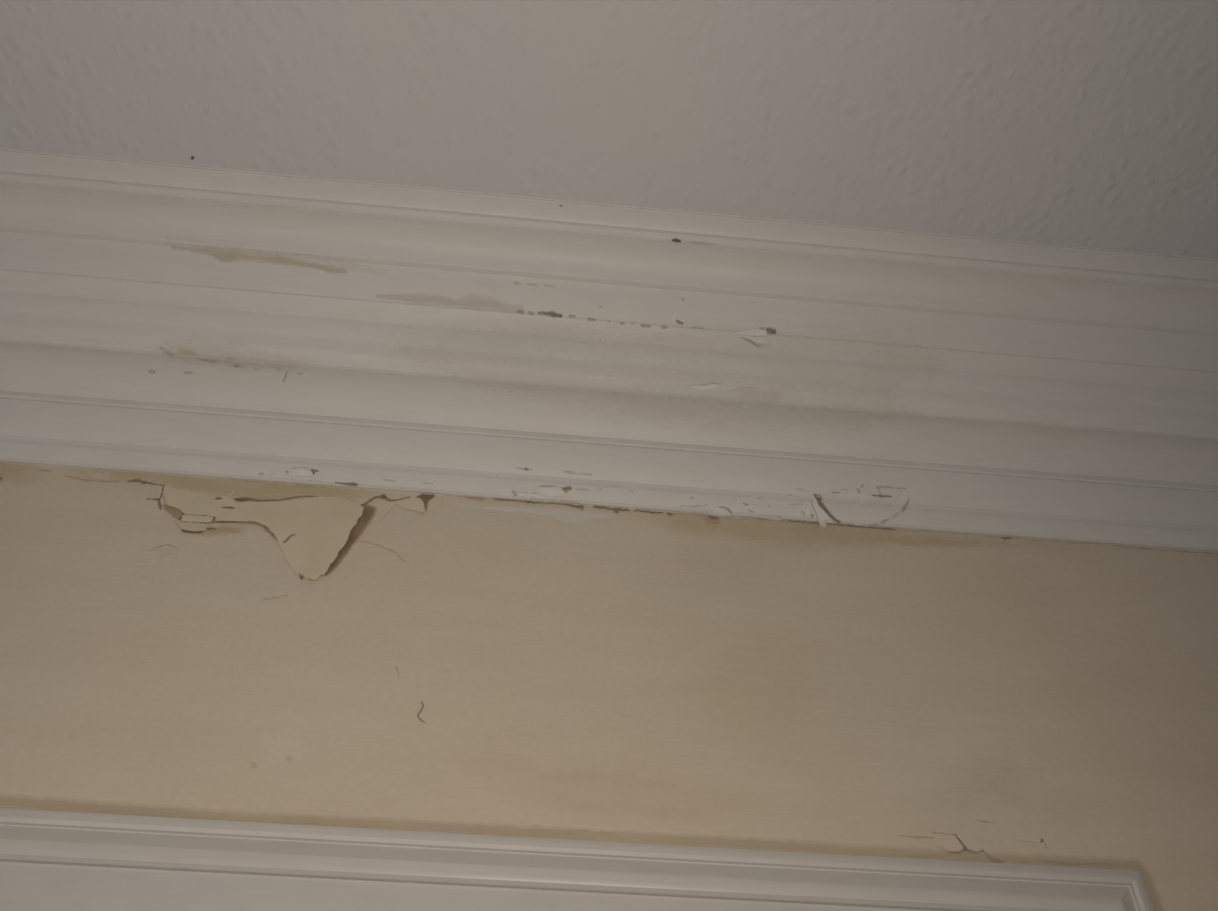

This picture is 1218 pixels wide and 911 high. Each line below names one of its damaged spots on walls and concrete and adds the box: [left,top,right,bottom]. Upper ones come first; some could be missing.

damp [172,247,346,273]
damp [115,471,357,497]
peeling [512,471,592,503]
peeling [790,484,909,527]
peeling [128,479,443,580]
crack [932,834,1003,862]